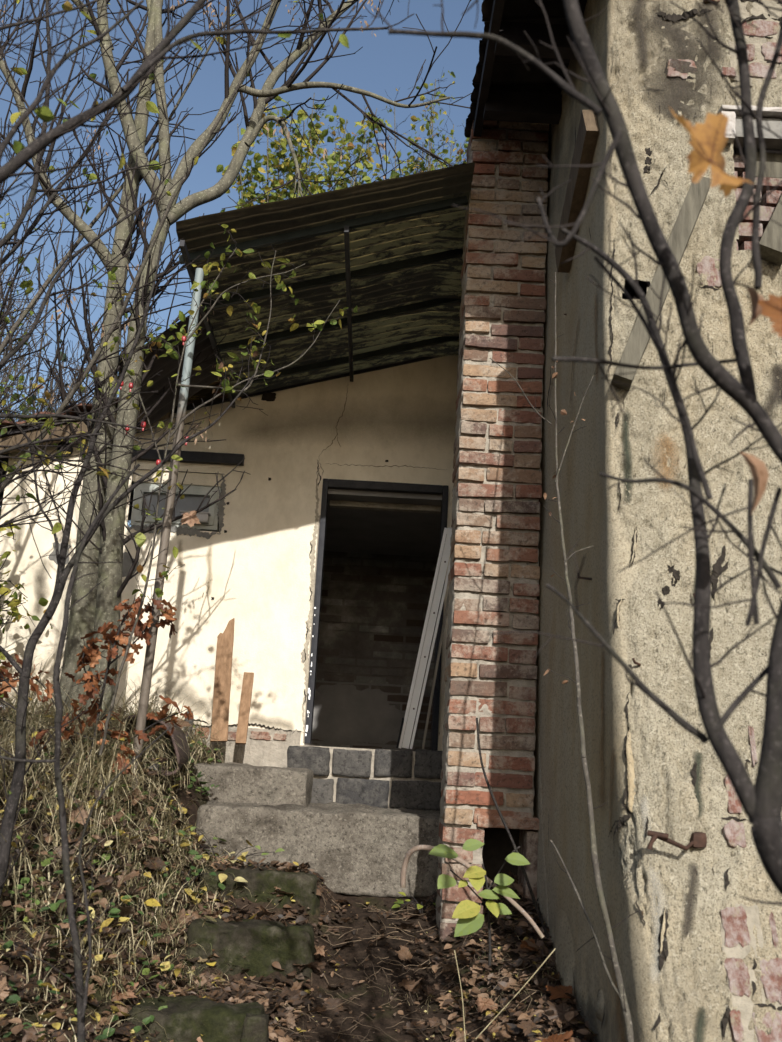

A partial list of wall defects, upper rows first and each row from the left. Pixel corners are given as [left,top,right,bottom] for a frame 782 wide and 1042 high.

spalling [664,59,697,80]
spalling [722,0,782,87]
spalling [719,903,782,1042]